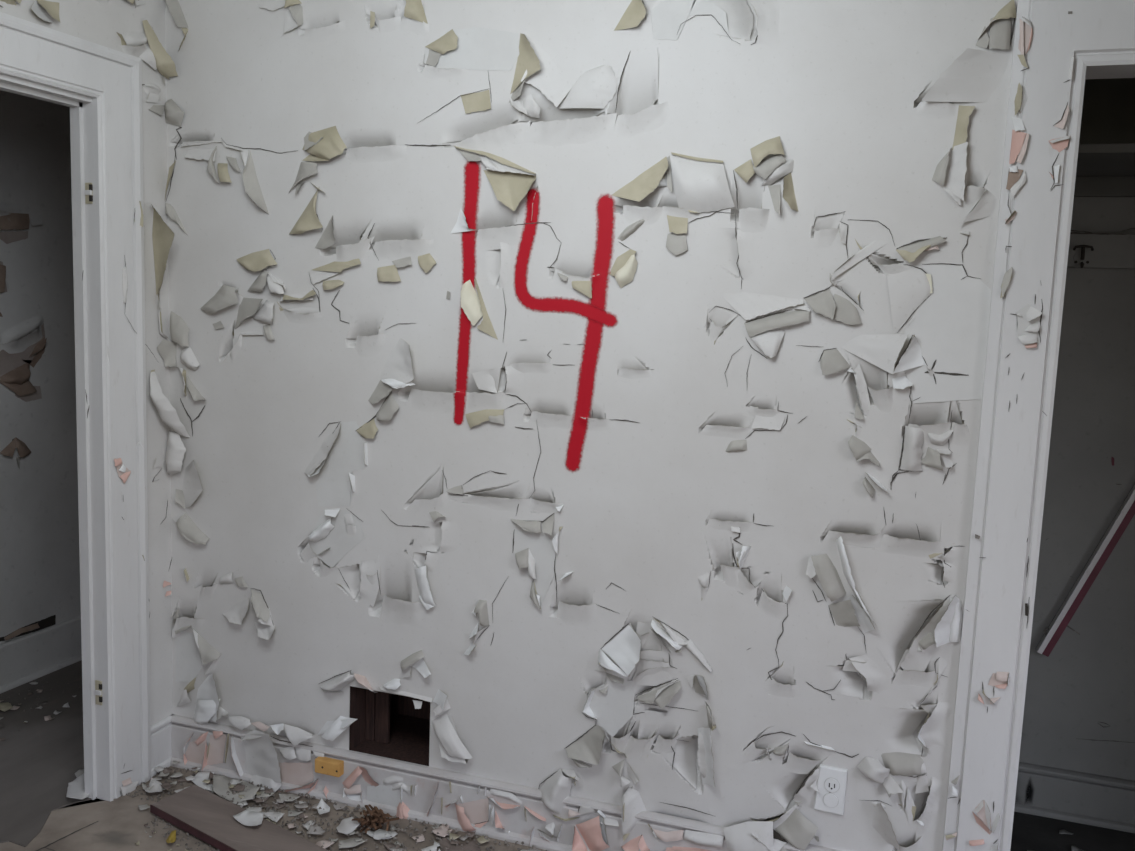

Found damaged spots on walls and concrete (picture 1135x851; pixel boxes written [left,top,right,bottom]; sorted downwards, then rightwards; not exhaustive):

peeling [913,0,1033,224]
peeling [454,146,536,211]
peeling [734,136,799,215]
peeling [542,156,726,298]
crack [707,214,755,287]
crack [924,201,980,280]
crack [616,350,654,379]
crack [502,341,639,497]
peeling [301,338,460,628]
crack [406,461,505,521]
crack [747,604,788,670]
peeling [120,504,967,851]